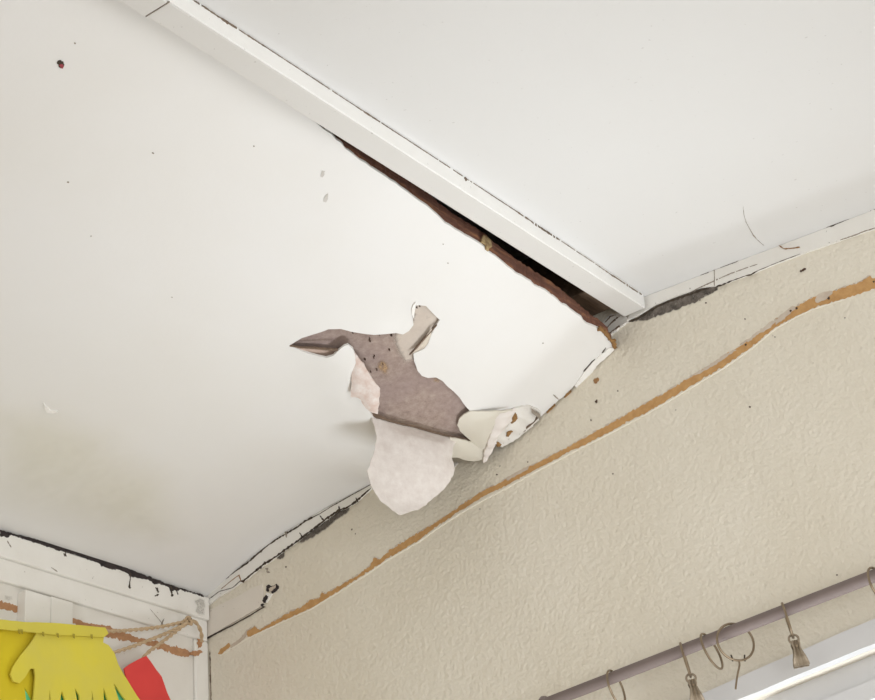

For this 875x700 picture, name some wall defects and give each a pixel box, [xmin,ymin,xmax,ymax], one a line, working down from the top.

crack [193,0,642,295]
crack [209,485,371,599]
peeling [218,275,875,656]
crack [605,315,620,334]